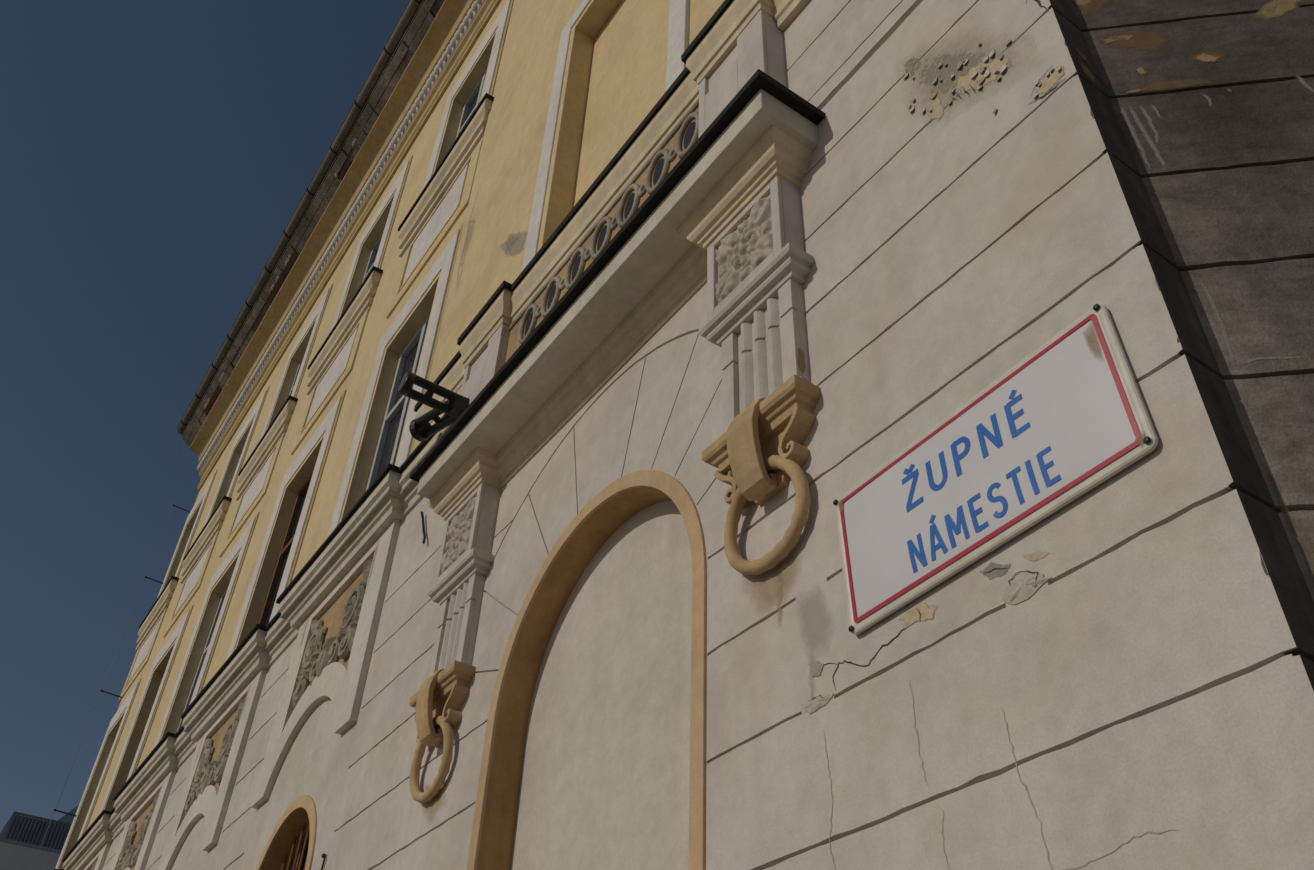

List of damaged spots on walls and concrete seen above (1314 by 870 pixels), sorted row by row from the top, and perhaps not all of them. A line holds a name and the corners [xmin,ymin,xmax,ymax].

peeling [1258,0,1300,17]
peeling [903,40,1013,120]
peeling [1126,67,1211,93]
peeling [1192,52,1223,63]
spalling [980,551,1049,580]
spalling [899,602,937,628]
crack [809,628,906,690]
crack [824,735,836,870]
crack [909,680,949,867]
crack [1002,709,1179,870]